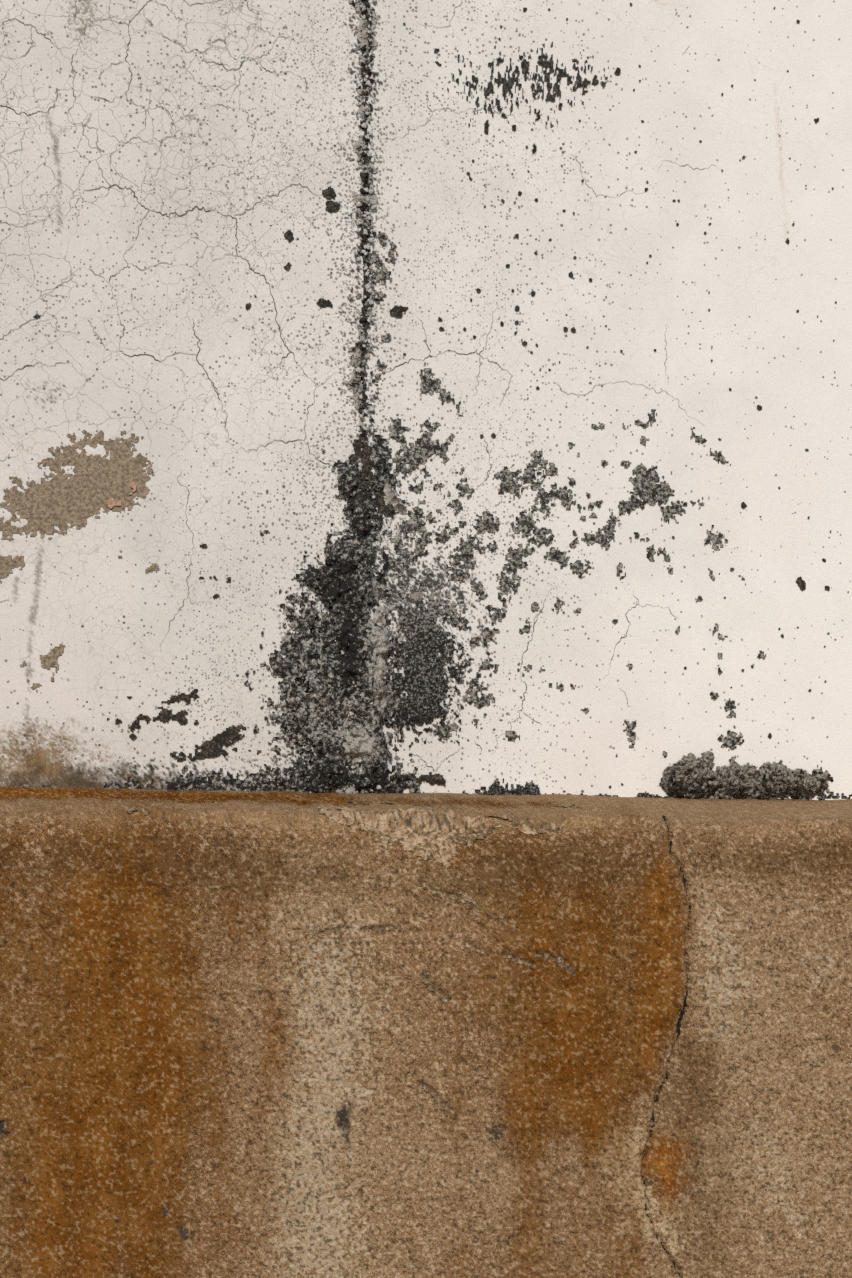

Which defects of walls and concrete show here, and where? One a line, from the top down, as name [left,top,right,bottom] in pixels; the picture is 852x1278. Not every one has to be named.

crack [0,0,517,551]
peeling [0,430,154,583]
damp [370,409,704,725]
damp [0,716,296,791]
damp [107,689,199,740]
rust [0,786,419,805]
spalling [318,800,560,867]
mould [462,773,583,795]
mould [637,691,852,800]
rust [0,845,215,1278]
rust [504,857,685,1158]
crack [642,815,694,1277]